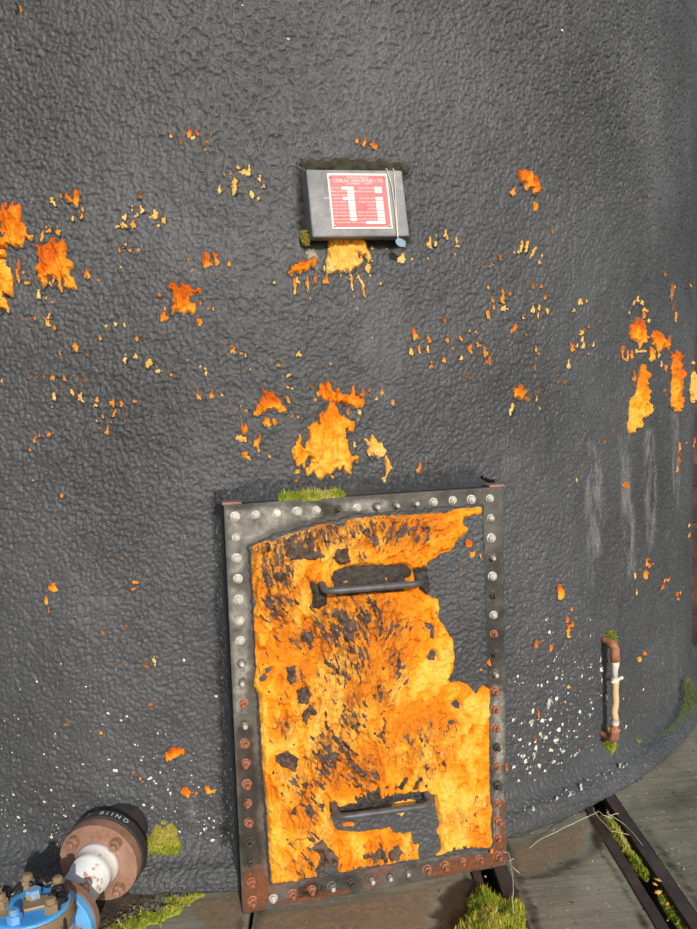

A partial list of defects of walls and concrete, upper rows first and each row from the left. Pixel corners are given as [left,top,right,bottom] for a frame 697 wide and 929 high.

peeling [49,187,86,222]
peeling [509,167,544,212]
peeling [154,250,232,333]
peeling [286,239,383,309]
peeling [386,240,413,264]
peeling [122,335,173,377]
peeling [194,388,224,400]
peeling [235,359,299,462]
peeling [289,378,401,483]
peeling [602,295,697,458]
peeling [675,437,696,473]